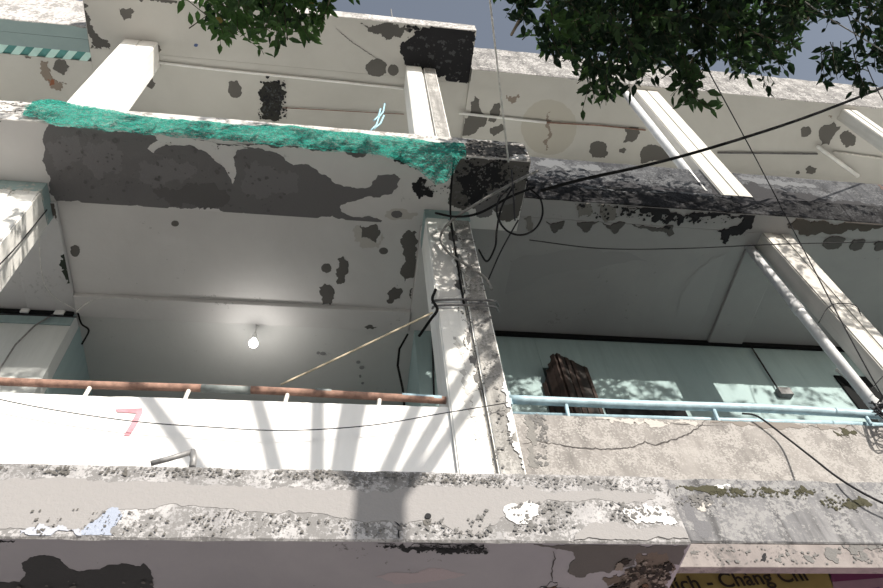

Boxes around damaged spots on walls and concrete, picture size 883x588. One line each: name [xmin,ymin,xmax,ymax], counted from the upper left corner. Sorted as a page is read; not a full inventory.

peeling [115,136,369,212]
spalling [546,221,565,233]
spalling [577,221,674,237]
peeling [501,380,525,469]
crack [524,420,719,450]
peeling [503,500,585,534]
peeling [600,501,678,526]
spalling [602,552,676,588]